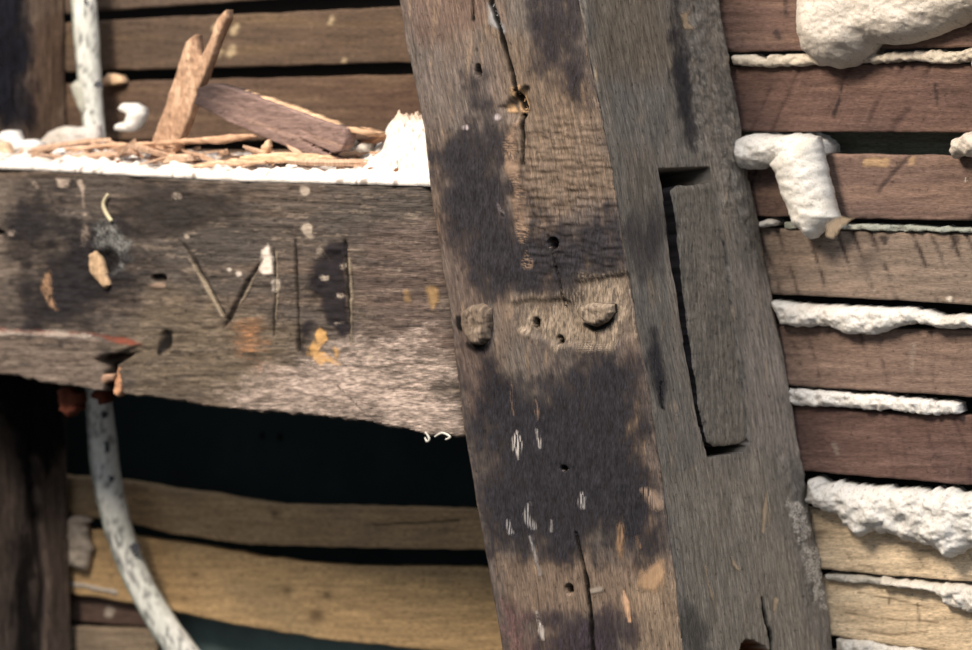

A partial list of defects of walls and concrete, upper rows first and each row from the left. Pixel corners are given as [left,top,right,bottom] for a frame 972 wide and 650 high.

water stain [0,0,37,130]
crack [471,0,529,164]
water stain [428,72,660,304]
water stain [309,241,351,336]
water stain [241,327,665,590]
crack [574,532,595,650]